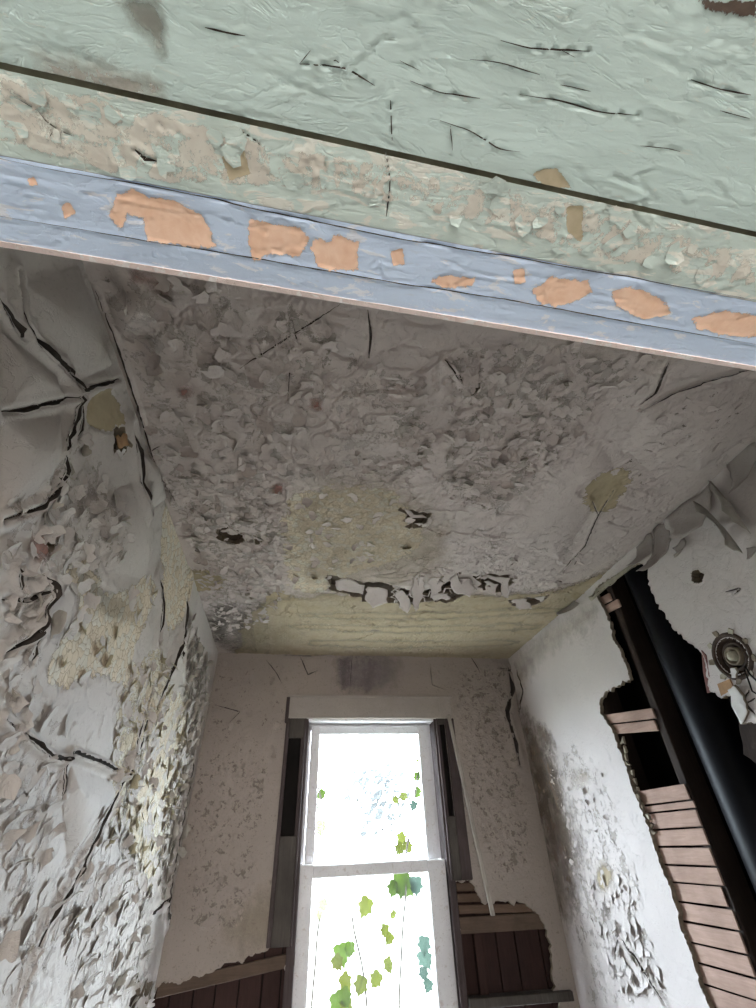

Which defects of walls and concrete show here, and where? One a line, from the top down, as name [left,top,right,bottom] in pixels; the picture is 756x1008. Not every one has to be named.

crack [0,40,753,300]
peeling [0,76,756,286]
crack [0,216,756,345]
crack [0,291,175,521]
crack [266,655,323,681]
flaking render [0,272,667,1008]
water stain [207,568,611,659]
crack [471,658,524,765]
water stain [517,703,574,916]
water stain [597,866,611,889]
spalling [556,442,756,1008]